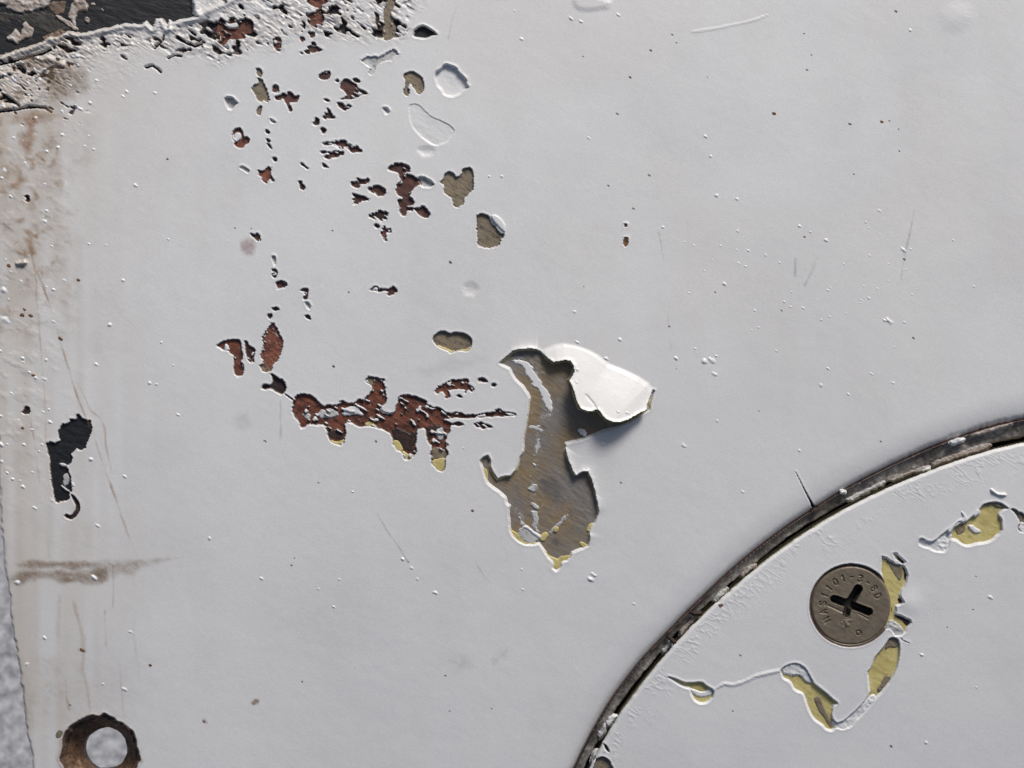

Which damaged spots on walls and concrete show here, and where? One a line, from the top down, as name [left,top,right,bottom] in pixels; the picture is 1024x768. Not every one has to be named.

peeling [0,0,436,183]
peeling [436,65,468,95]
peeling [351,163,474,218]
peeling [369,210,391,240]
peeling [477,214,506,248]
peeling [218,307,514,471]
peeling [47,415,92,519]
peeling [481,342,654,570]
peeling [919,502,1024,551]
peeling [781,554,910,729]
peeling [669,677,713,702]